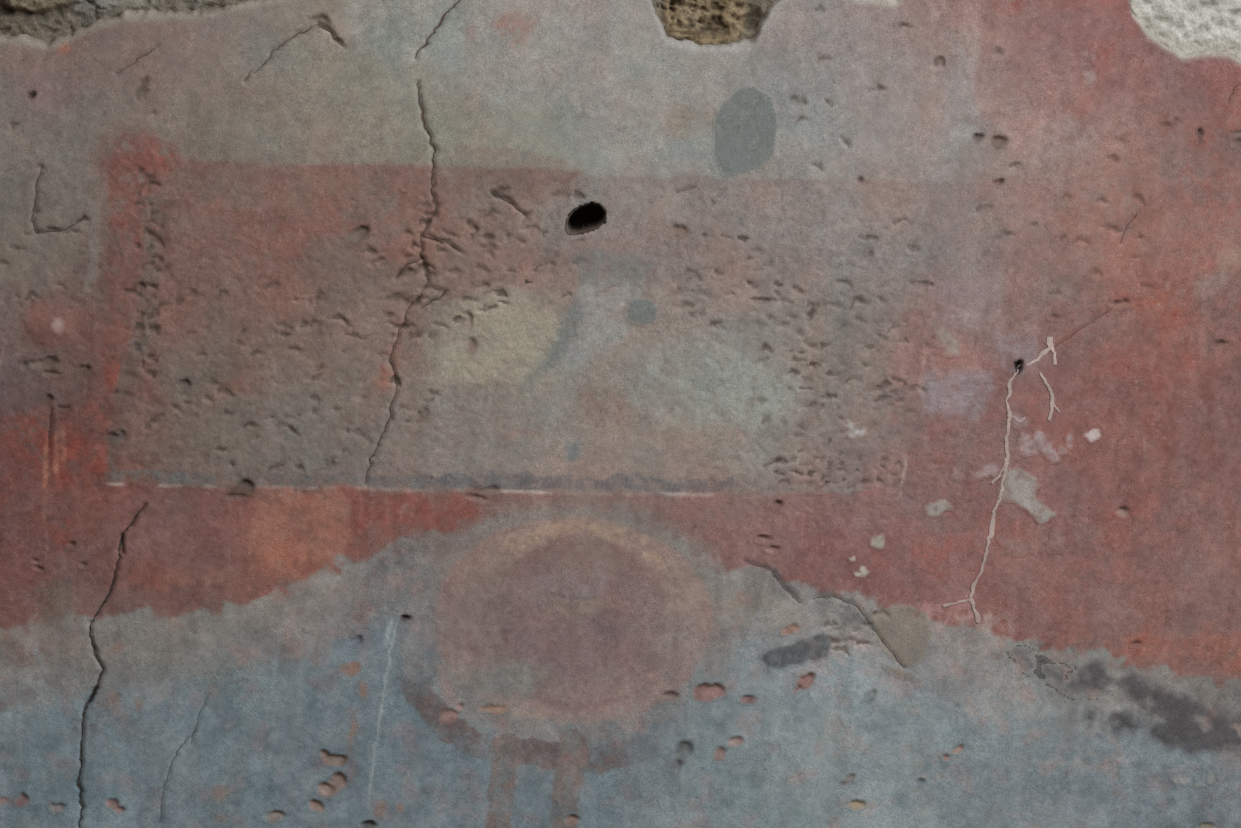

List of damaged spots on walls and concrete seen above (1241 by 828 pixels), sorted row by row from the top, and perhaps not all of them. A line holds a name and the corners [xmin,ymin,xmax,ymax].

flaking render [304,13,347,49]
spalling [1129,0,1241,59]
crack [366,0,460,481]
leakage [933,327,1054,429]
crack [77,505,145,827]
leakage [675,637,707,828]